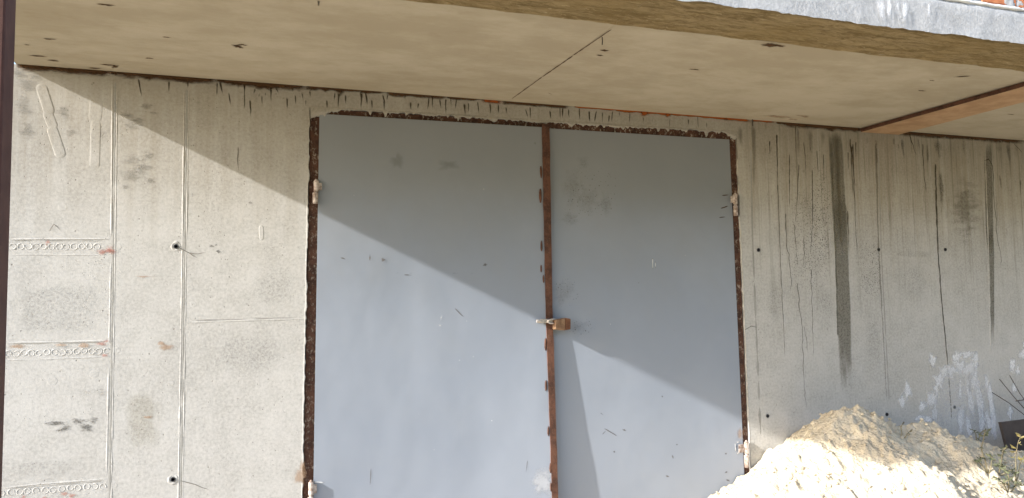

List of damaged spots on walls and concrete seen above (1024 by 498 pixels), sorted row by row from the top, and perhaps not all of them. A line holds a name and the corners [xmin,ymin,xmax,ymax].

corrosion [17,30,861,132]
damp [769,127,878,371]
crack [910,137,952,417]
damp [899,350,1013,437]